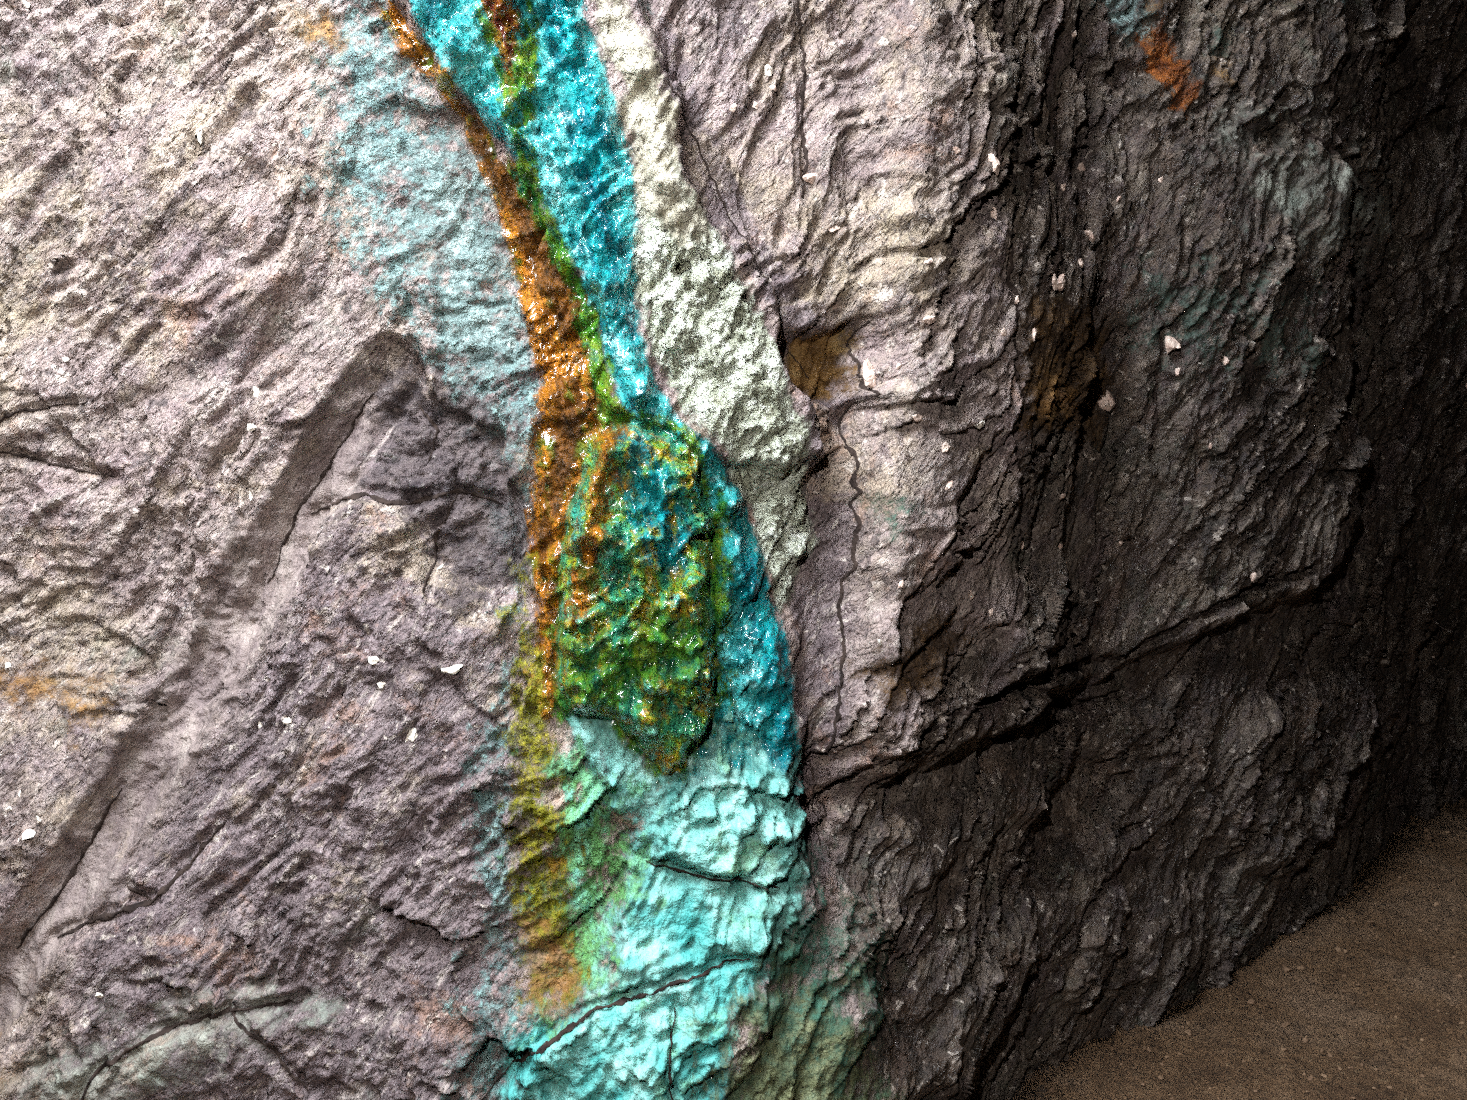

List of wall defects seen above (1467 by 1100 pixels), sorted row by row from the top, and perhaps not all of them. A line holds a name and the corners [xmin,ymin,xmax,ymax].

corrosion [1130,4,1224,116]
crack [0,402,115,477]
corrosion [380,0,627,720]
water stain [302,0,899,1100]
corrosion [787,323,857,399]
crack [1006,147,1022,469]
crack [808,309,1310,845]
crack [646,860,779,891]